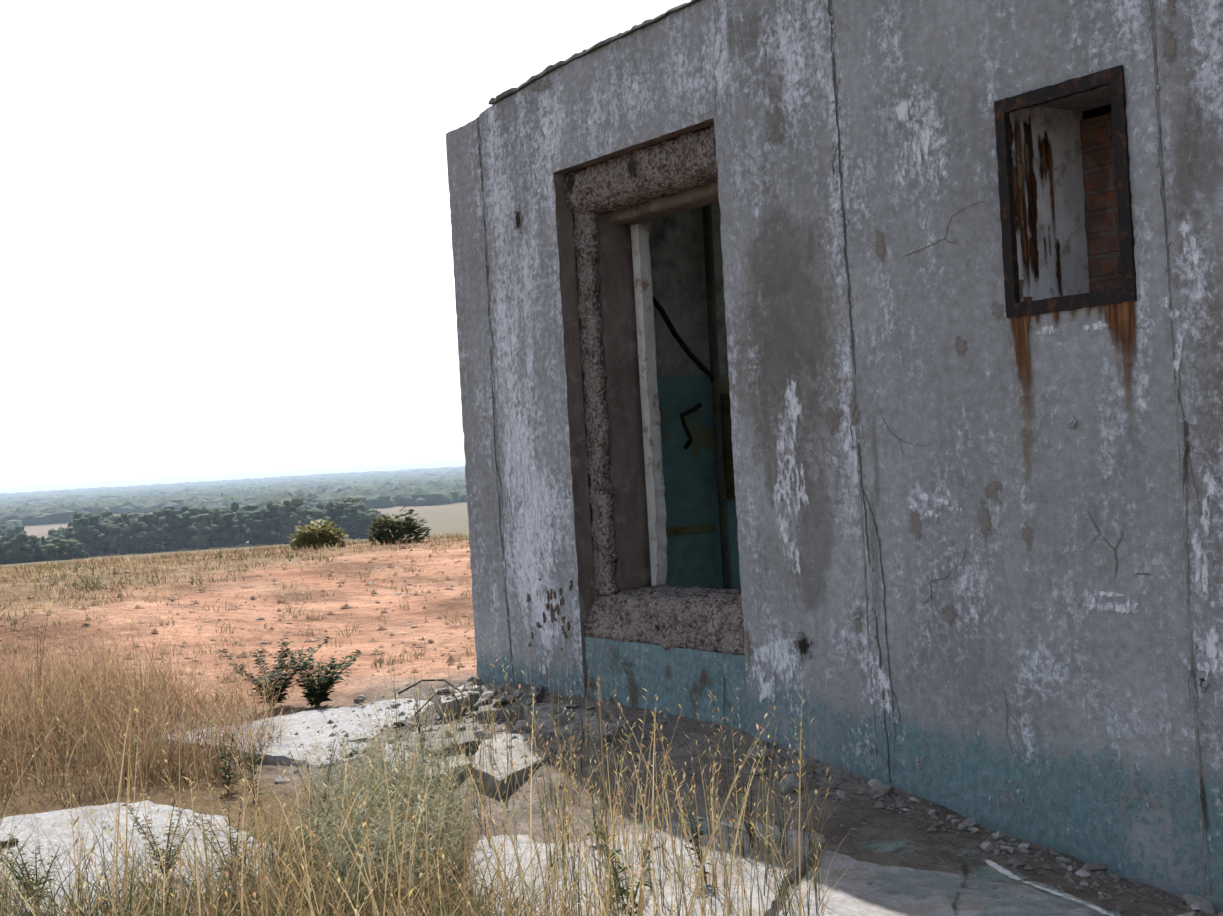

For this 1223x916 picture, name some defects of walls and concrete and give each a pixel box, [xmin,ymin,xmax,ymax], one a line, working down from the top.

rust [1009,115,1063,382]
rust [1054,301,1135,365]